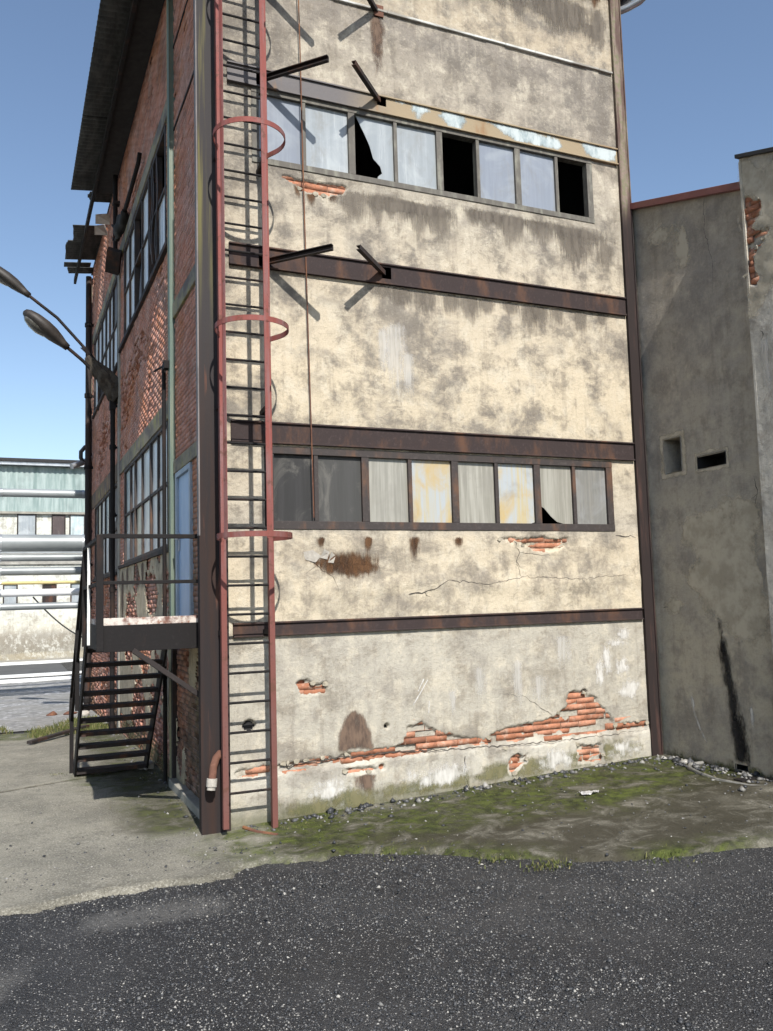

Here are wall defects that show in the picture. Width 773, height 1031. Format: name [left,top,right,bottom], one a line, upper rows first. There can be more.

flaking render [282,175,346,198]
flaking render [741,158,773,317]
leakage [376,286,562,327]
flaking render [303,549,336,563]
crack [409,542,625,597]
flaking render [498,536,567,552]
flaking render [296,680,328,695]
leakage [717,615,750,763]
flaking render [238,690,649,777]